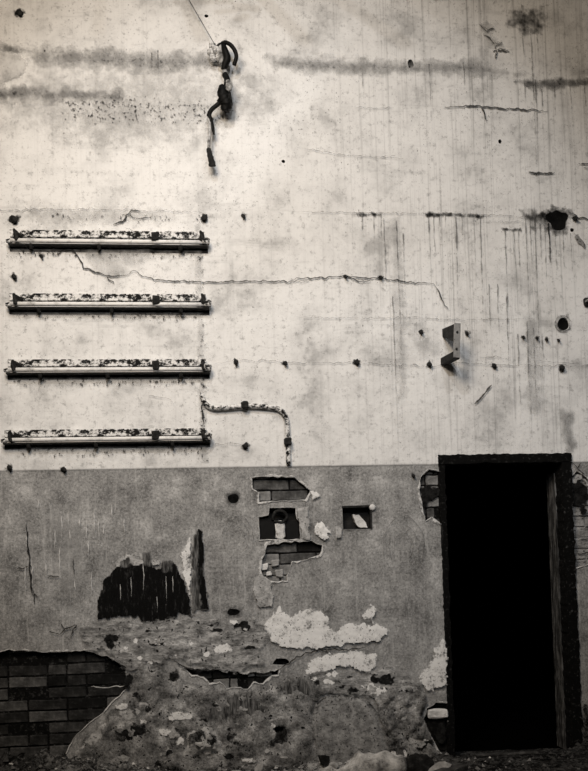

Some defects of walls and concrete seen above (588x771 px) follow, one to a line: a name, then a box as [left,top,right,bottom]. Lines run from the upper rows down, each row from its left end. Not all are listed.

damp [36,50,211,69]
damp [275,58,490,73]
damp [514,78,588,105]
crack [445,105,547,121]
crack [57,248,512,321]
damp [564,414,575,449]
flaking render [250,474,320,504]
flaking render [418,469,440,524]
flaking render [572,471,588,568]
flaking render [258,536,323,583]
flaking render [0,603,449,771]